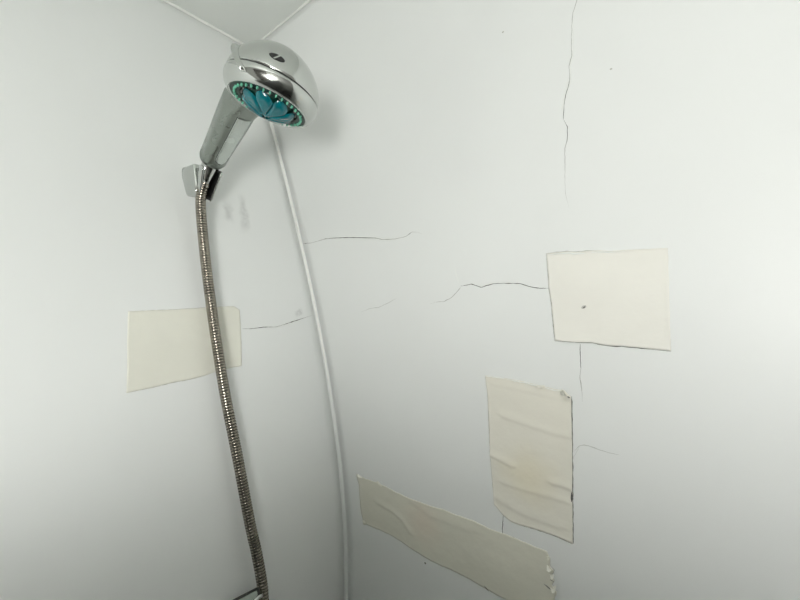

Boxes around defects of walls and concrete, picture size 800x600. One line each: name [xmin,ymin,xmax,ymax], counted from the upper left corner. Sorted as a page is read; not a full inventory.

crack [562,1,577,155]
crack [305,233,421,244]
crack [434,262,545,303]